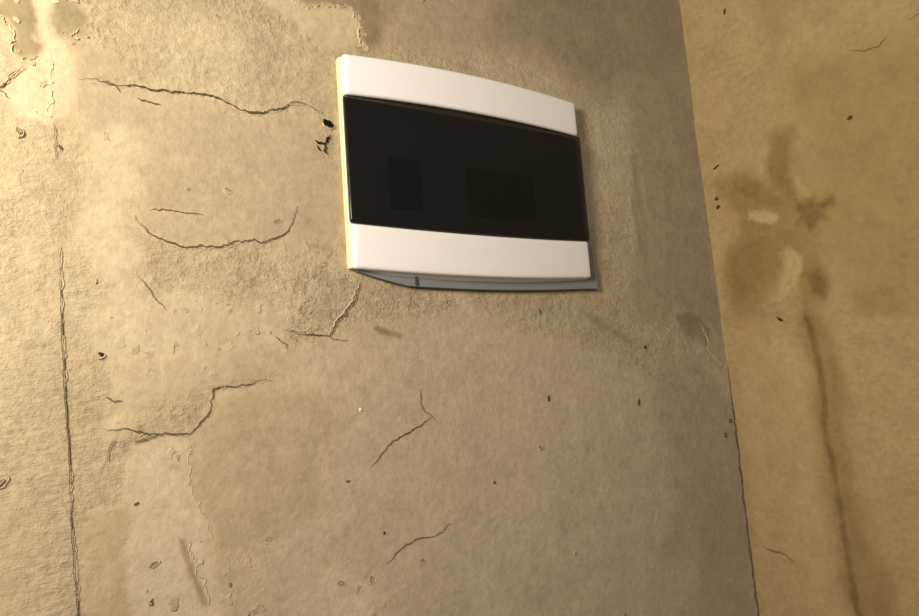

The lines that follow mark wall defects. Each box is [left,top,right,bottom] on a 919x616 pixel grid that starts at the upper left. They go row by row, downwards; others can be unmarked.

crack [80,78,323,116]
crack [315,135,331,154]
crack [133,208,298,250]
crack [276,283,360,348]
water stain [300,0,919,616]
crack [103,380,270,459]